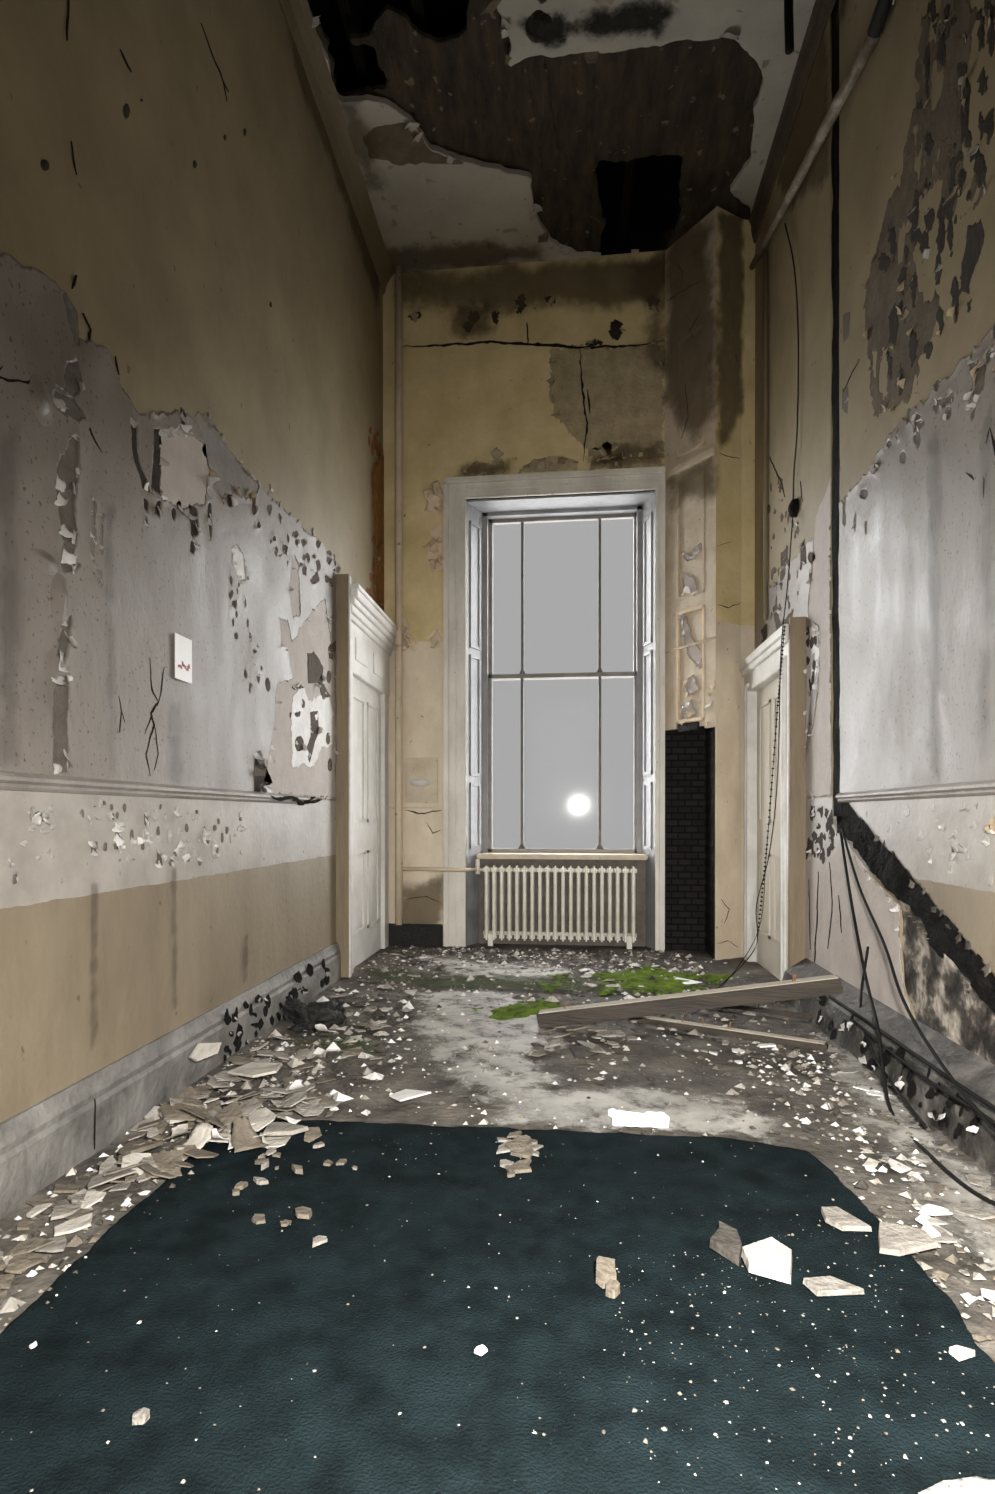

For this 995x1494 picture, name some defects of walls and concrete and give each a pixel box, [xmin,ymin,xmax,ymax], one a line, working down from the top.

damp [522,0,672,47]
spalling [312,0,763,255]
damp [283,9,744,443]
peeling [843,0,995,463]
damp [462,464,508,476]
crack [402,322,649,461]
damp [598,445,660,467]
damp [669,458,715,497]
peeling [129,407,341,798]
crack [119,663,165,776]
flaking render [761,463,911,1020]
peeling [223,959,331,1061]